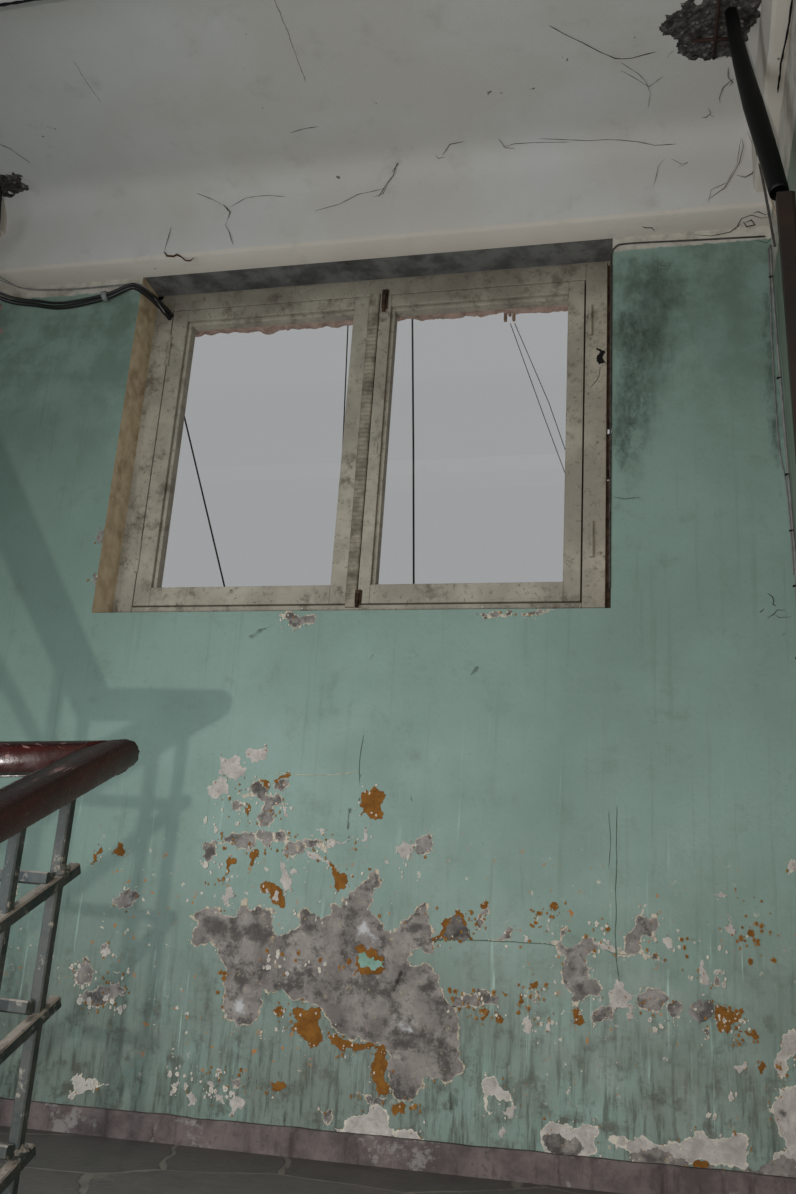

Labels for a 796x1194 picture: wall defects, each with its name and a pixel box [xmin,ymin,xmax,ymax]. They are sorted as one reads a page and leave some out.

crack [0,0,39,8]
spalling [659,0,762,61]
crack [777,0,793,93]
flaking render [188,744,779,1140]
peeling [167,1065,287,1117]
flaking render [608,1028,796,1178]